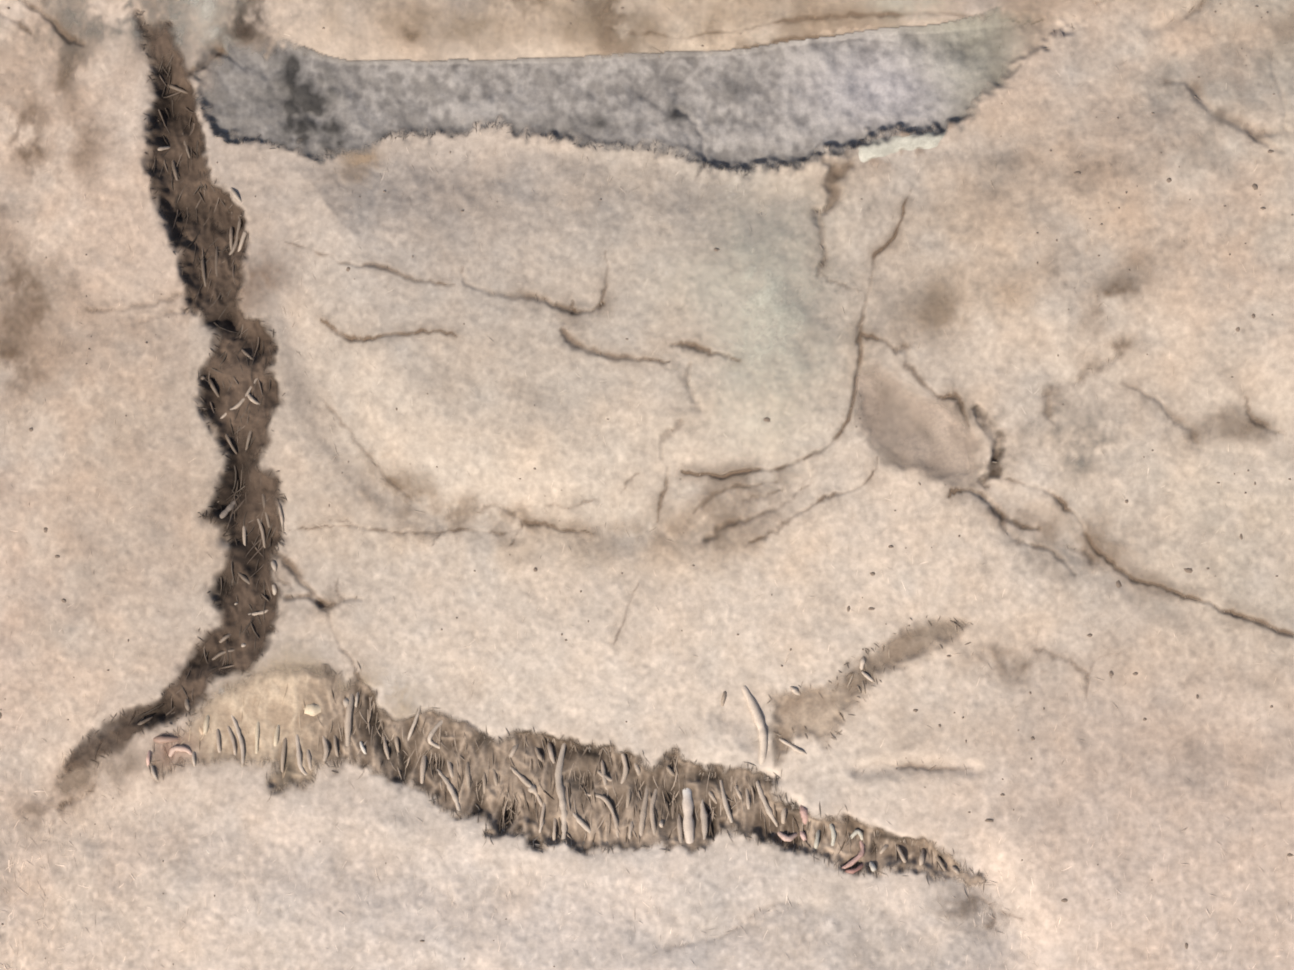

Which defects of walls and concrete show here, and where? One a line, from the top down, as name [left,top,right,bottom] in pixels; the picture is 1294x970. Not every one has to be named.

crack [191,49,228,73]
peeling [197,12,1012,177]
crack [872,201,906,259]
crack [320,319,456,342]
crack [526,291,737,363]
crack [835,332,878,438]
crack [912,369,965,415]
crack [500,521,589,535]
crack [658,455,810,543]
crack [948,453,1294,635]
crack [282,557,334,607]
peeling [721,615,973,765]